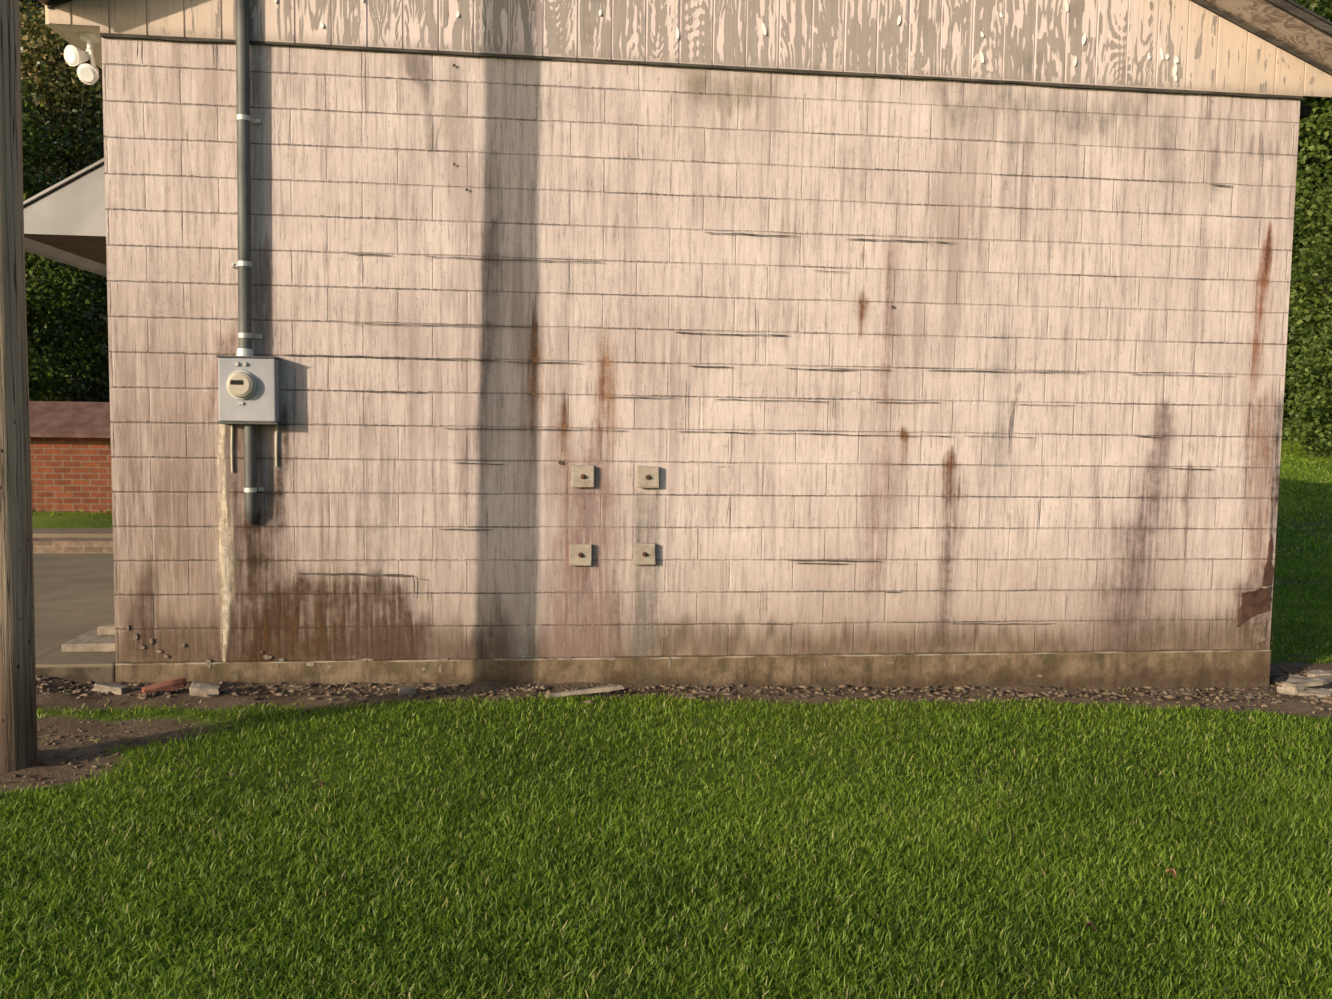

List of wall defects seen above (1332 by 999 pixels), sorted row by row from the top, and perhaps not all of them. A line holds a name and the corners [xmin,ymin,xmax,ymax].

corrosion [1259,225,1271,321]
corrosion [528,317,538,405]
water stain [125,415,447,663]
corrosion [947,456,960,504]
water stain [1108,404,1169,651]
spalling [1237,533,1274,645]